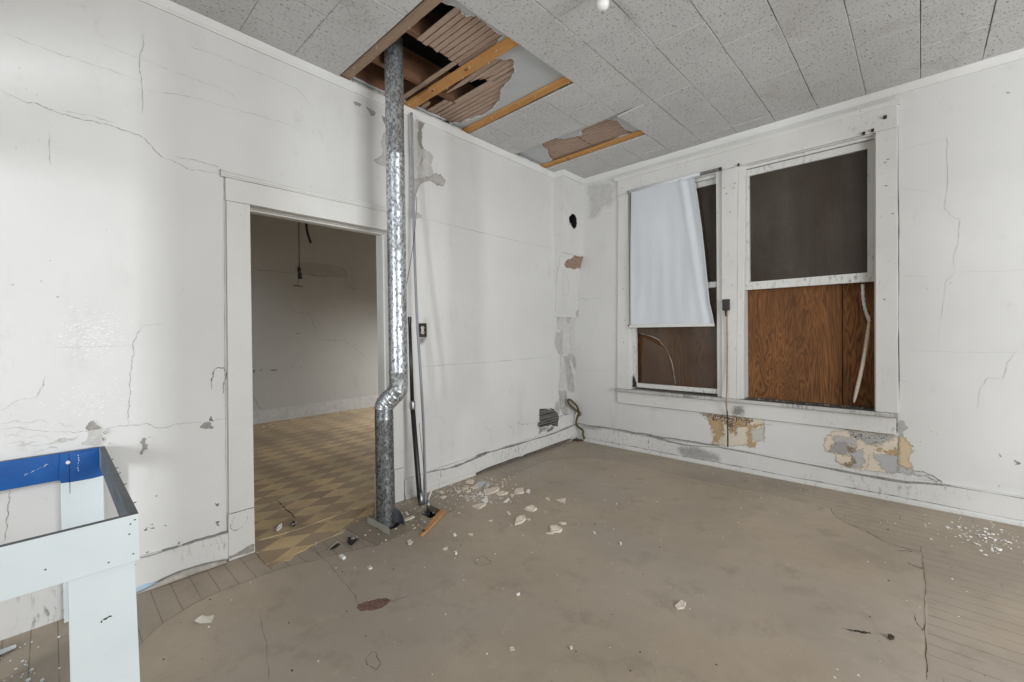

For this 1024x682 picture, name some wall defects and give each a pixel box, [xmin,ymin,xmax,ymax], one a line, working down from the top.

crack [9,94,220,174]
spalling [564,255,583,270]
crack [898,139,1011,338]
peeling [48,420,111,446]
crack [0,323,219,449]
spalling [518,408,563,434]
crack [896,308,904,391]
crack [833,513,928,675]